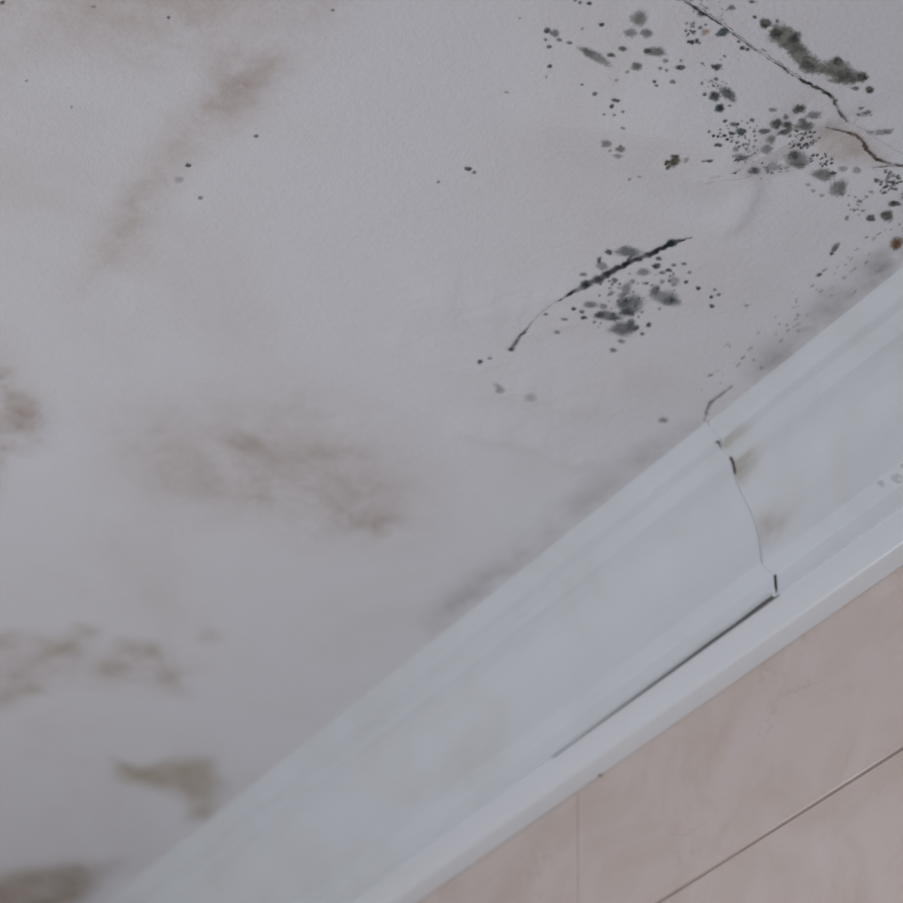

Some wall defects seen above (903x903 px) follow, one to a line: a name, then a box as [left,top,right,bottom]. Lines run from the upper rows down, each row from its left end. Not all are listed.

water stain [685,8,728,44]
crack [684,0,903,168]
water stain [753,16,874,93]
water stain [703,56,845,195]
water stain [866,170,902,221]
water stain [597,247,637,263]
crack [559,238,690,301]
water stain [563,297,651,335]